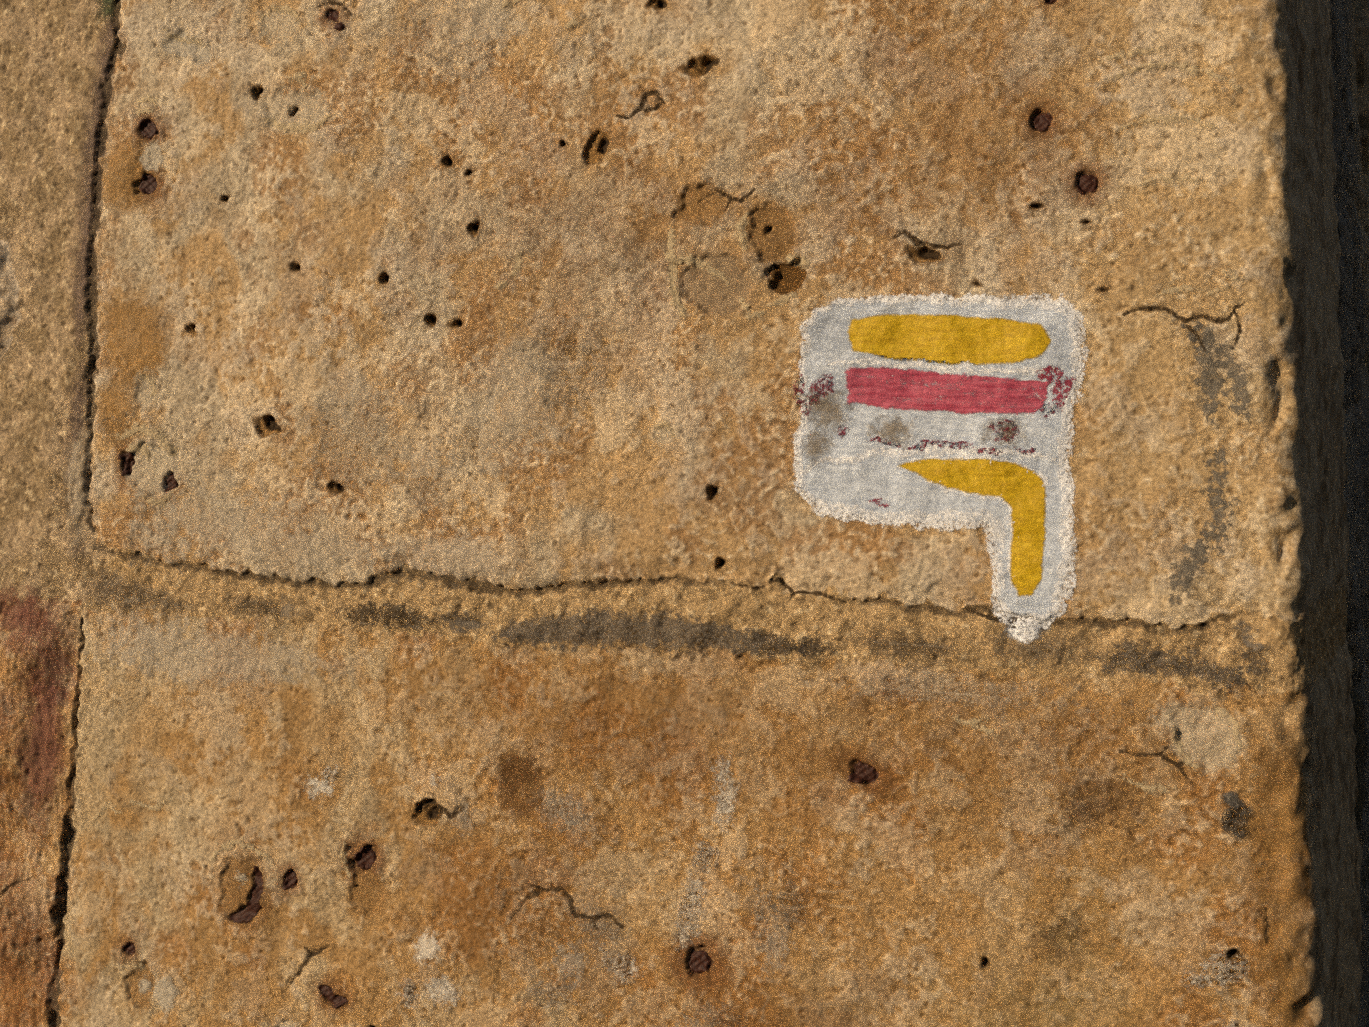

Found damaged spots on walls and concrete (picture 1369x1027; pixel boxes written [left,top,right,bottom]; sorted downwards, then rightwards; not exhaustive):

crack [83,0,1244,634]
water stain [1181,321,1252,429]
water stain [1168,445,1241,607]
water stain [335,600,839,660]
rust [229,866,264,923]
rust [281,867,298,891]
crack [510,885,623,931]
rust [674,937,723,986]